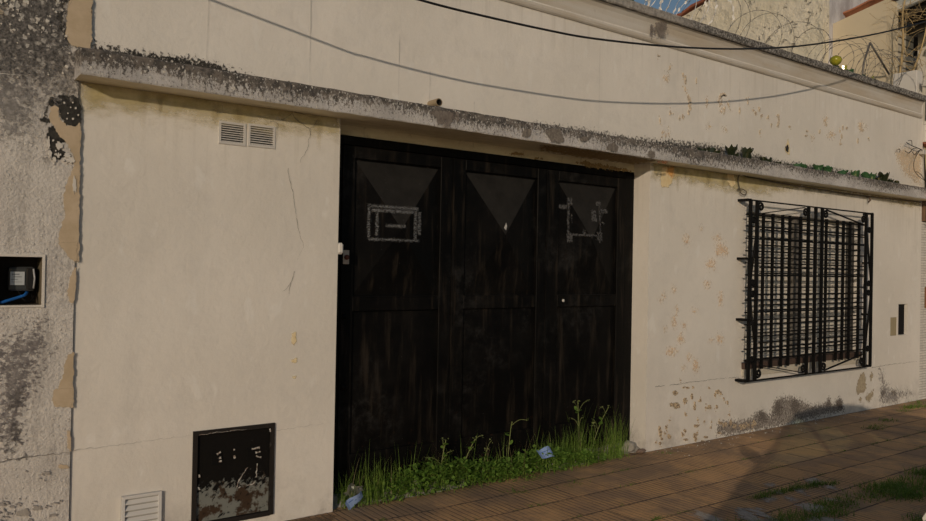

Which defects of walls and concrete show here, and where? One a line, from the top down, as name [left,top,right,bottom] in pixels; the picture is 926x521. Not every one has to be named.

damp [53,0,70,43]
spalling [534,128,675,187]
flaking render [49,105,82,305]
damp [0,314,58,461]
flaking render [52,352,75,408]
peeling [655,378,729,447]
damp [694,395,845,442]
peeling [856,372,874,402]
damp [878,368,913,407]